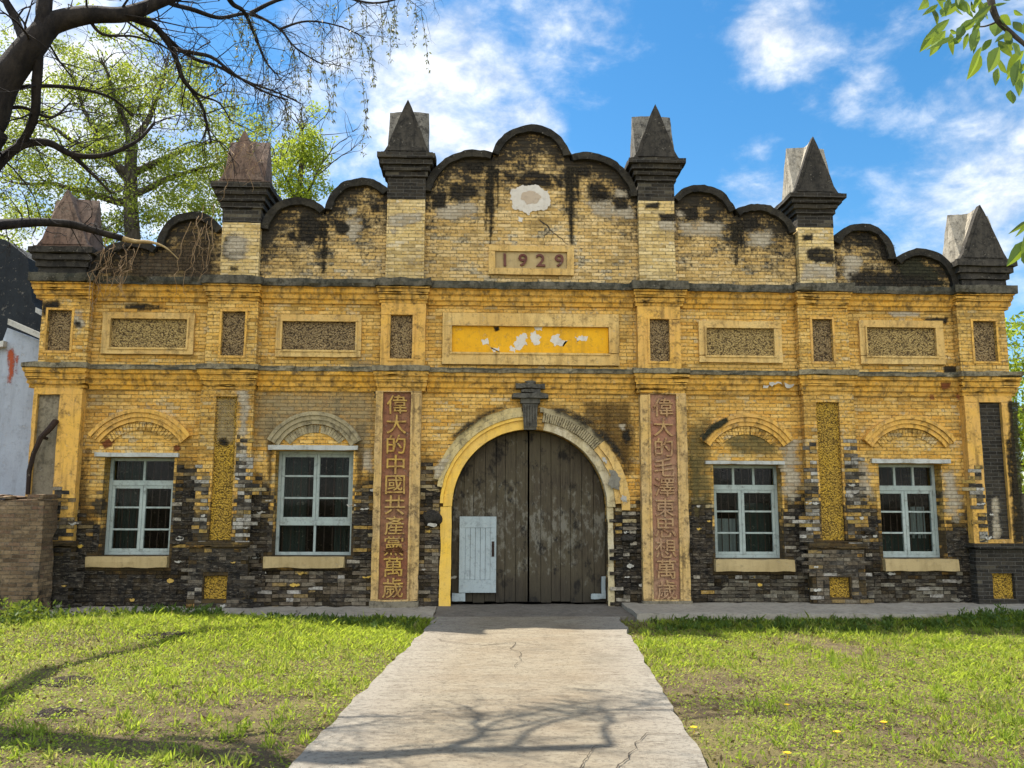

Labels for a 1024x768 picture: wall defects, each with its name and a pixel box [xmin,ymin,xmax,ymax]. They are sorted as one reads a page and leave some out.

leakage [288,208,361,273]
peeling [510,184,551,222]
leakage [371,162,771,265]
leakage [801,232,946,287]
peeling [481,327,588,352]